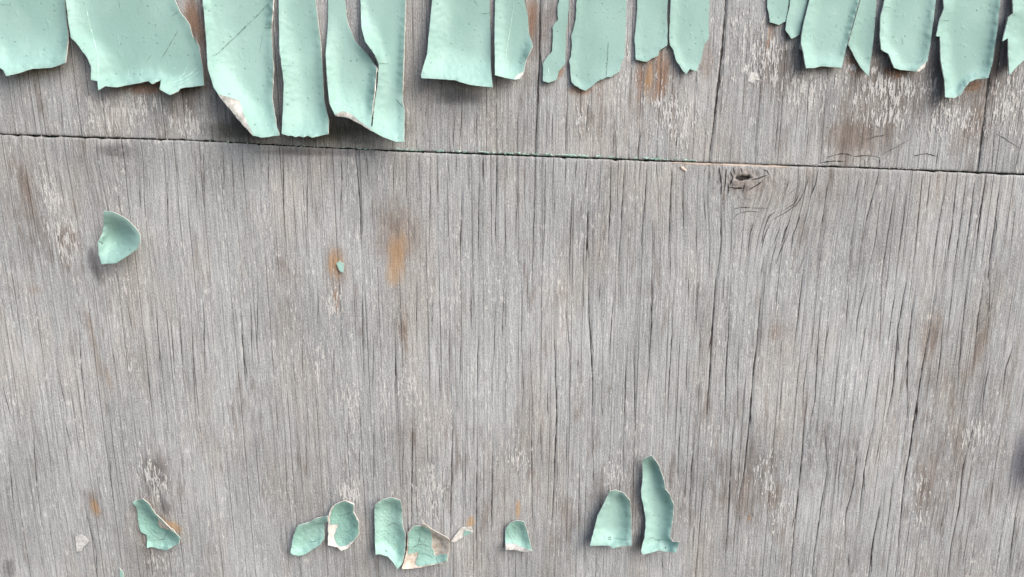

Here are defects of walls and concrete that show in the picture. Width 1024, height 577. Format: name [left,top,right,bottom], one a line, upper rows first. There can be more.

peeling [0,0,406,142]
peeling [421,0,533,88]
peeling [543,0,710,91]
peeling [767,0,1024,98]
crack [195,110,368,232]
crack [57,333,87,445]
crack [147,297,205,415]
crack [242,304,258,373]
crack [362,296,396,381]
crack [393,0,1024,577]
peeling [374,497,473,569]
peeling [590,455,680,555]